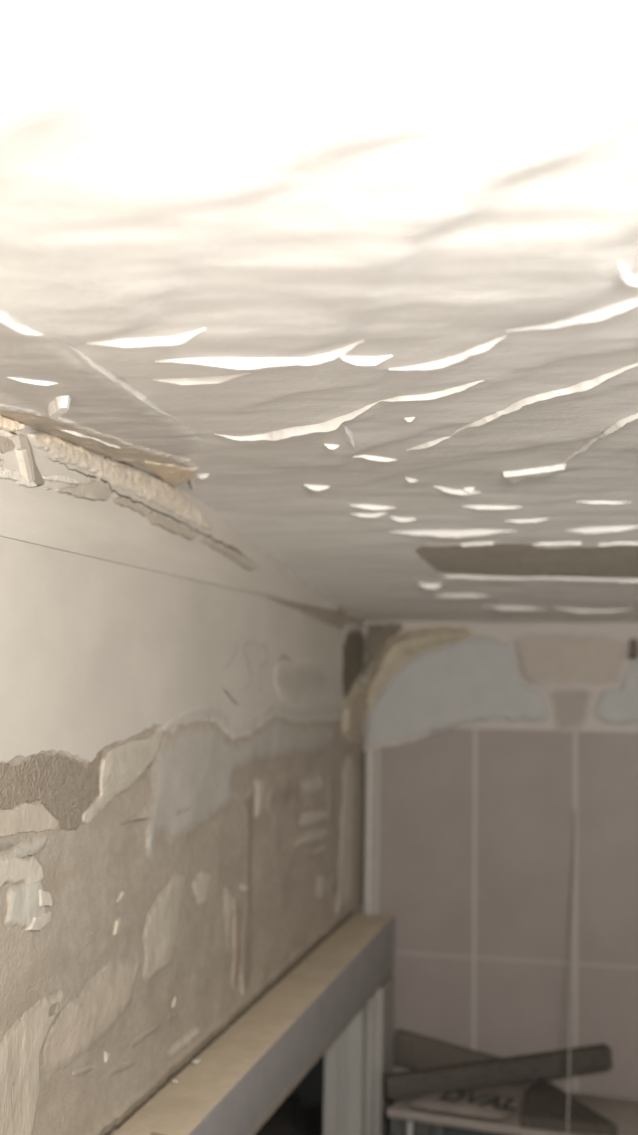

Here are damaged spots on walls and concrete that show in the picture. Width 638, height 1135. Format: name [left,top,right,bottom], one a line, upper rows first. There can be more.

flaking render [0,403,212,531]
flaking render [416,541,638,584]
flaking render [0,727,163,932]
flaking render [294,773,330,855]
flaking render [0,870,211,1135]
crack [88,749,365,1135]